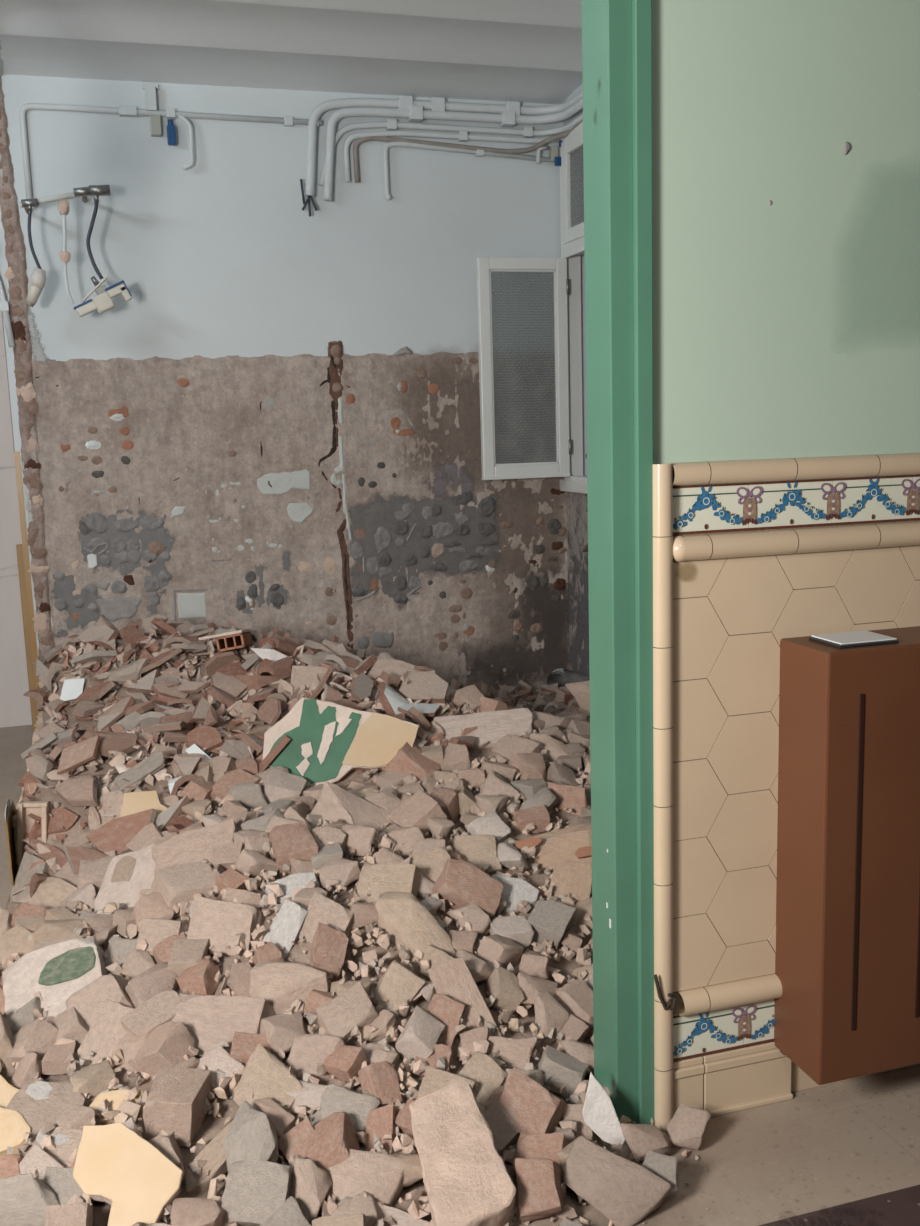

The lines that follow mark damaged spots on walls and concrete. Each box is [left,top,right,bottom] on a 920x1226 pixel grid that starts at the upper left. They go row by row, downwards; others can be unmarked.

flaking render [32,346,590,713]
crack [318,341,357,649]
spalling [16,751,165,871]
spalling [185,744,211,760]
spalling [270,782,426,878]
spalling [384,742,459,822]
spalling [479,773,592,872]
spalling [519,733,569,762]
spalling [215,868,248,896]